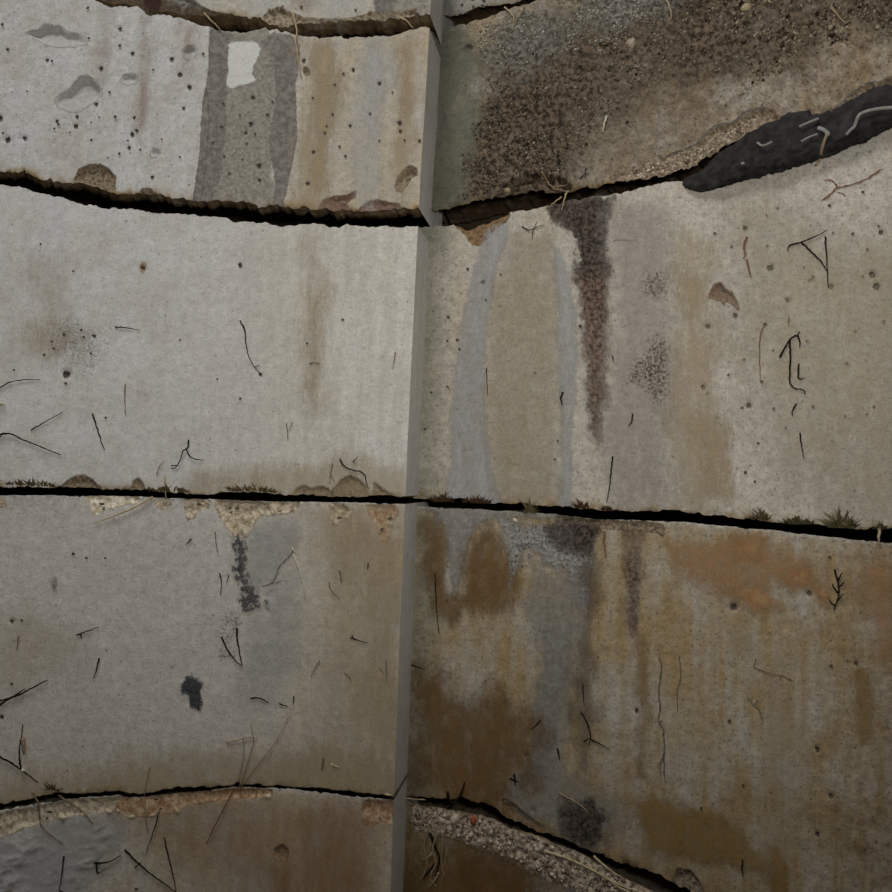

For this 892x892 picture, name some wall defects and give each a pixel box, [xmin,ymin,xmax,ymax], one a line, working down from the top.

spalling [55,75,103,113]
spalling [618,106,783,182]
crack [662,103,767,157]
crack [821,168,883,202]
spalling [184,474,399,547]
leakage [426,194,670,849]
leakage [230,535,269,613]
rust [424,530,518,622]
leakage [184,679,203,711]
spalling [362,799,393,827]
spalling [409,798,652,892]
spalling [673,868,703,892]